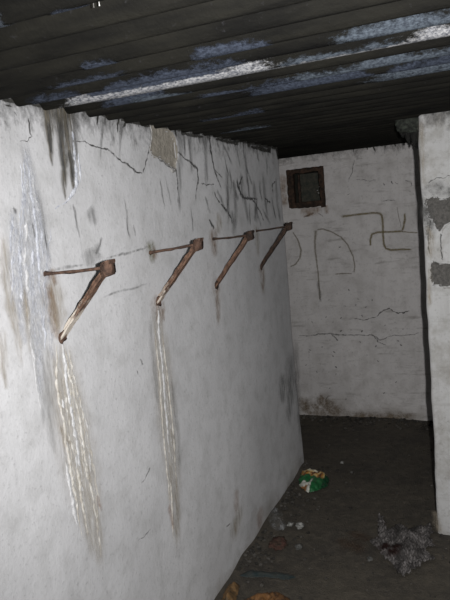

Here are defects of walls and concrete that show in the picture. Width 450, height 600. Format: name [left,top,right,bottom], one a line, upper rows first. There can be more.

damp [32,104,81,209]
crack [78,141,149,173]
flaking render [149,125,178,173]
crack [176,136,232,220]
crack [237,178,270,220]
flaking render [424,197,450,233]
flaking render [430,261,450,289]
crack [356,308,415,345]
damp [9,152,101,555]
damp [155,306,178,538]